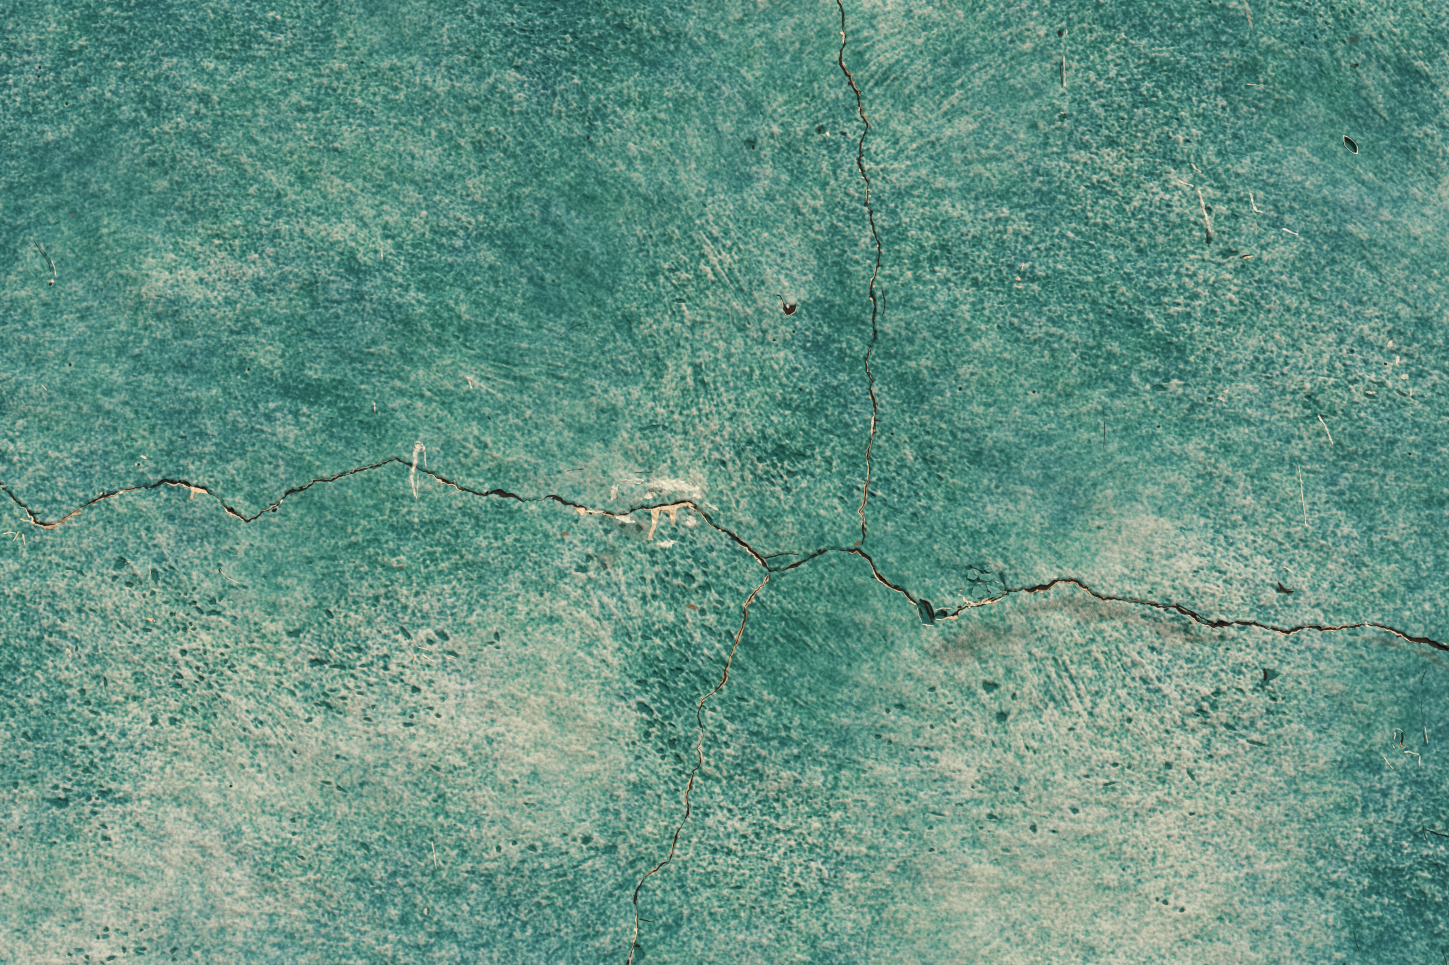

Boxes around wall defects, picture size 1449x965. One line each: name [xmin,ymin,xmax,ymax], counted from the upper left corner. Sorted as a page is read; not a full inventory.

crack [0,0,935,965]
crack [945,576,1449,652]
crack [1422,822,1449,888]